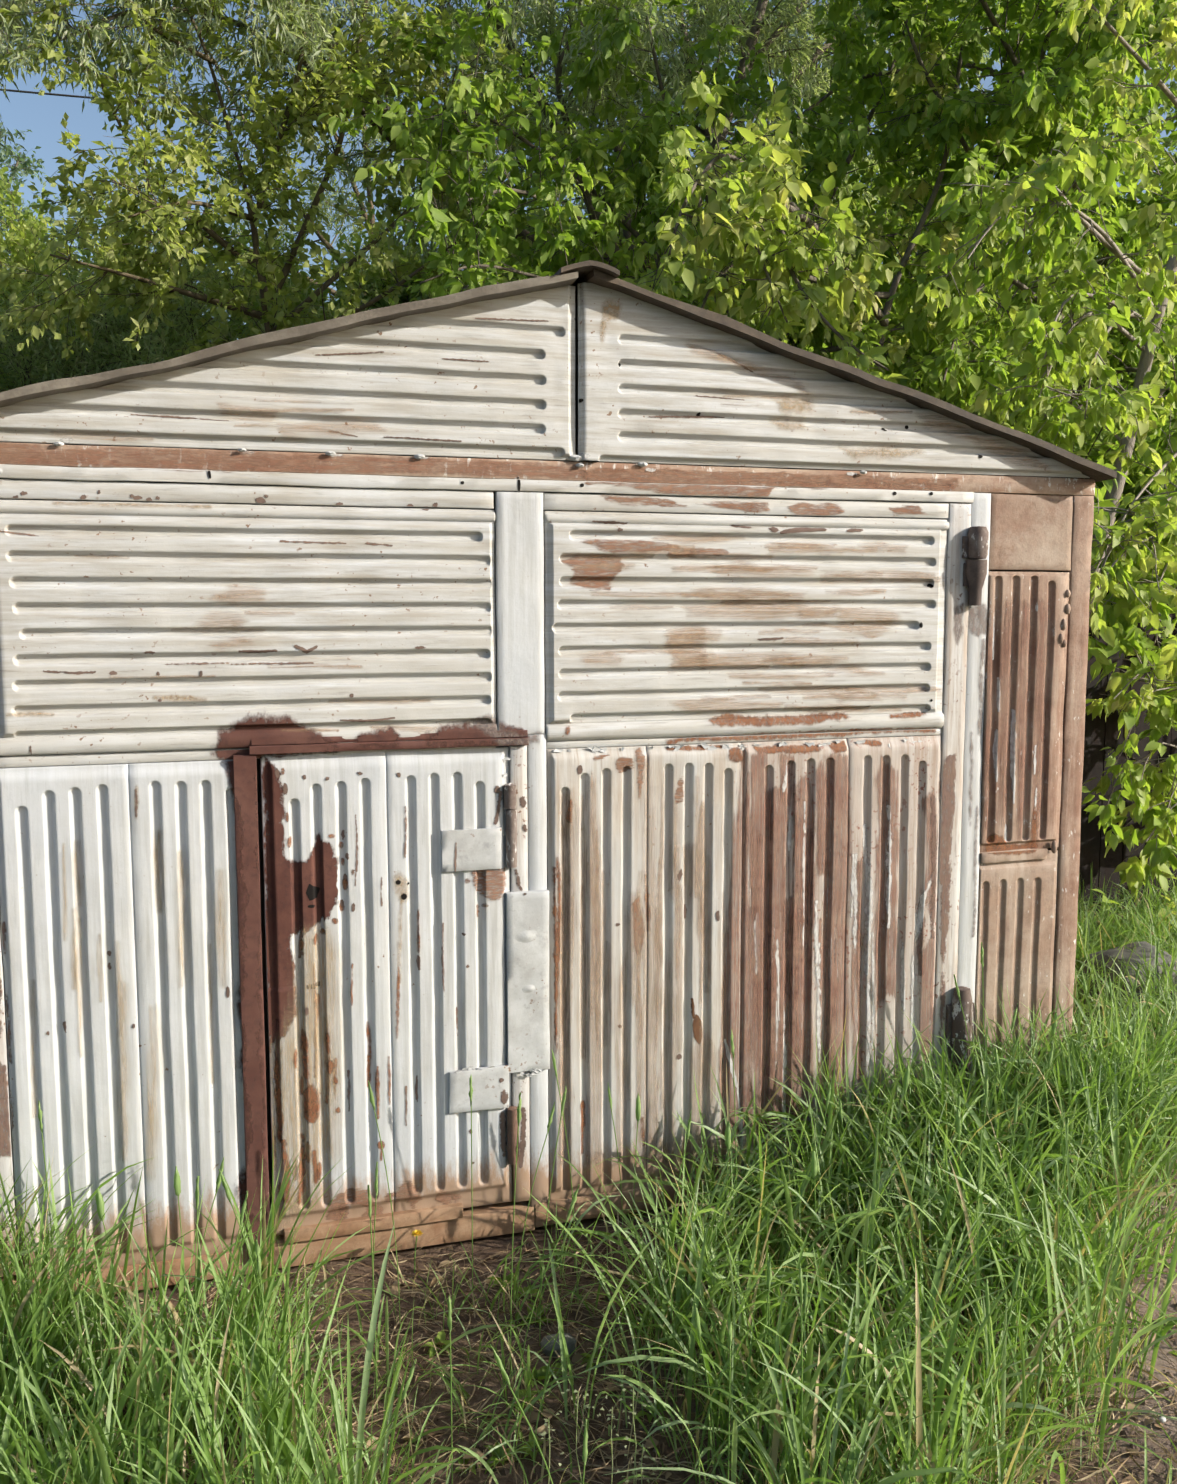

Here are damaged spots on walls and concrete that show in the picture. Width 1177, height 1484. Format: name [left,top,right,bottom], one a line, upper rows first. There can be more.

rust [0,438,957,515]
rust [562,537,940,744]
rust [300,815,358,950]
peeling [465,863,527,917]
rust [552,860,611,1043]
rust [633,823,680,956]
rust [746,773,862,1159]
rust [916,754,956,1047]
rust [986,806,1038,855]
rust [272,965,418,1204]
peeling [456,1066,543,1168]
rust [326,1181,462,1223]